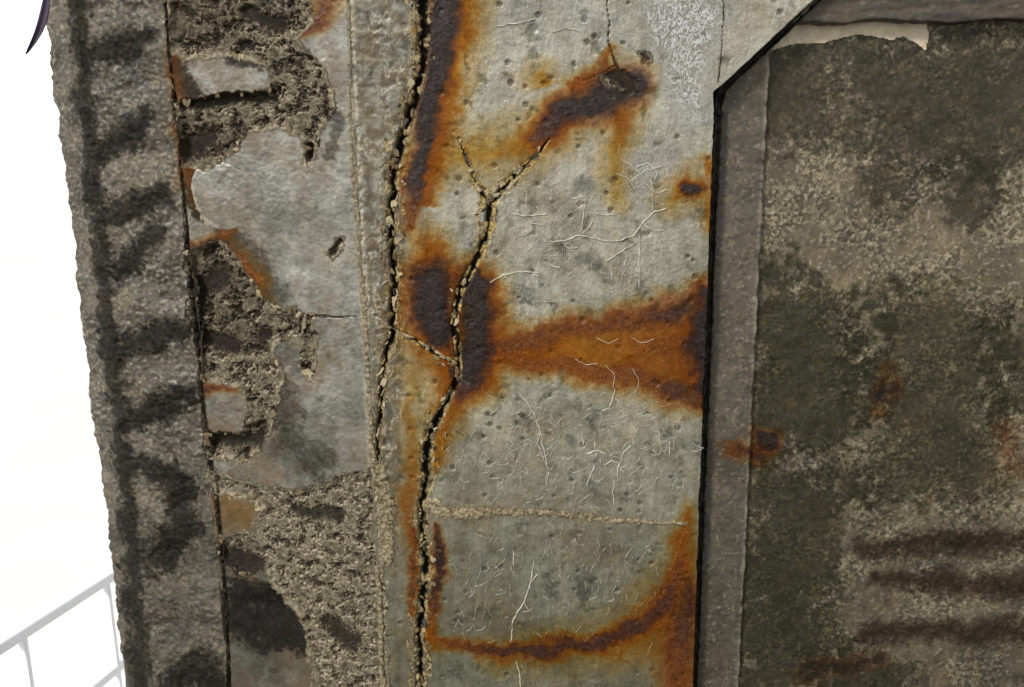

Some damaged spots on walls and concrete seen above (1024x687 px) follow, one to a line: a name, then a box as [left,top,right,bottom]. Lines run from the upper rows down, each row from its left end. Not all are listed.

spalling [166,0,336,172]
rust [403,0,460,229]
rust [528,47,647,146]
rust [681,183,700,195]
water stain [766,23,1024,232]
crack [263,0,703,687]
rust [411,246,708,429]
spalling [182,235,391,687]
water stain [740,244,1024,687]
rust [408,523,697,687]